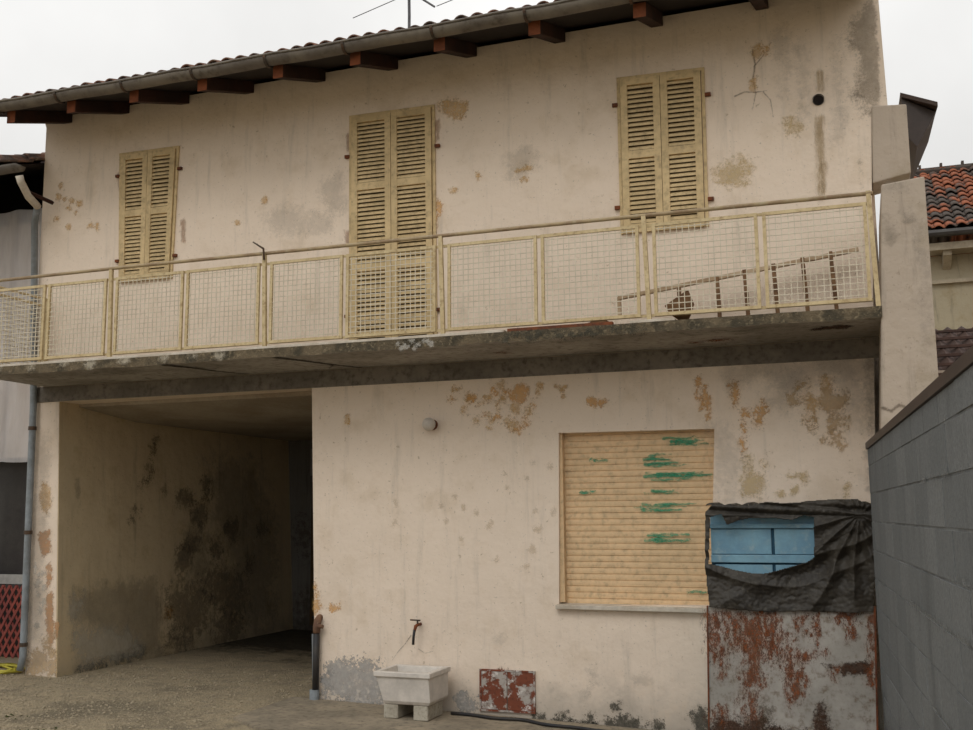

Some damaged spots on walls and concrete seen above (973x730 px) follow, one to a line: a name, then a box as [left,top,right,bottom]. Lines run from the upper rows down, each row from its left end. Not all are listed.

spalling [38,529,60,649]
corrosion [702,609,880,730]